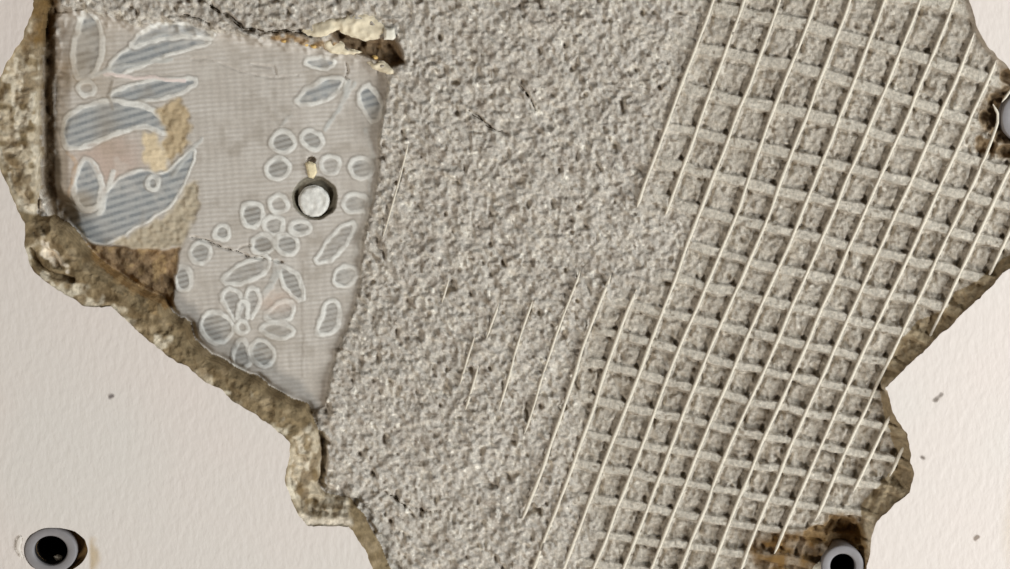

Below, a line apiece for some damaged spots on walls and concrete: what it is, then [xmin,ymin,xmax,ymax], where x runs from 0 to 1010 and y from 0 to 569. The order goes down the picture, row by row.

crack [180,0,306,35]
flaking render [0,0,778,569]
flaking render [562,0,1010,569]